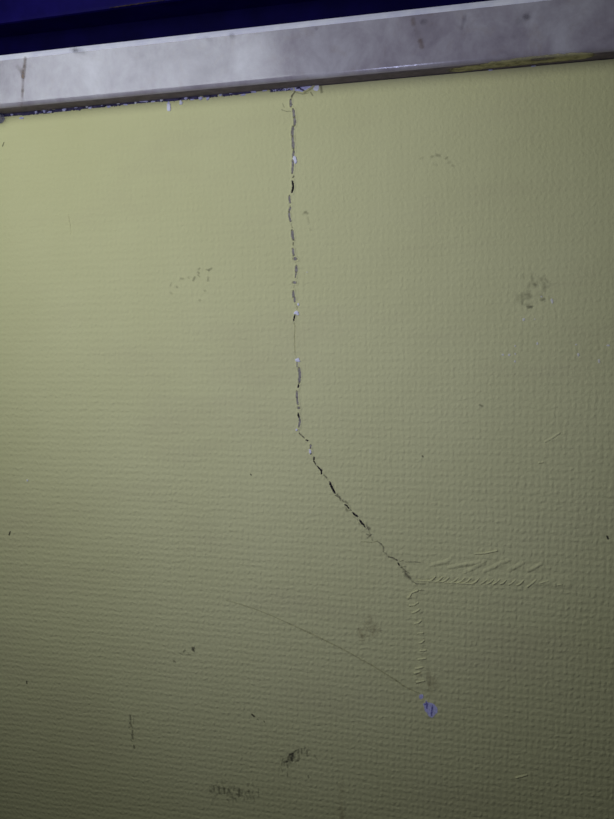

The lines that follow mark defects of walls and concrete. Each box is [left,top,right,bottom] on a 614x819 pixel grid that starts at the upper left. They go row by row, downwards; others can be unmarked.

crack [3,88,300,324]
crack [294,358,368,530]